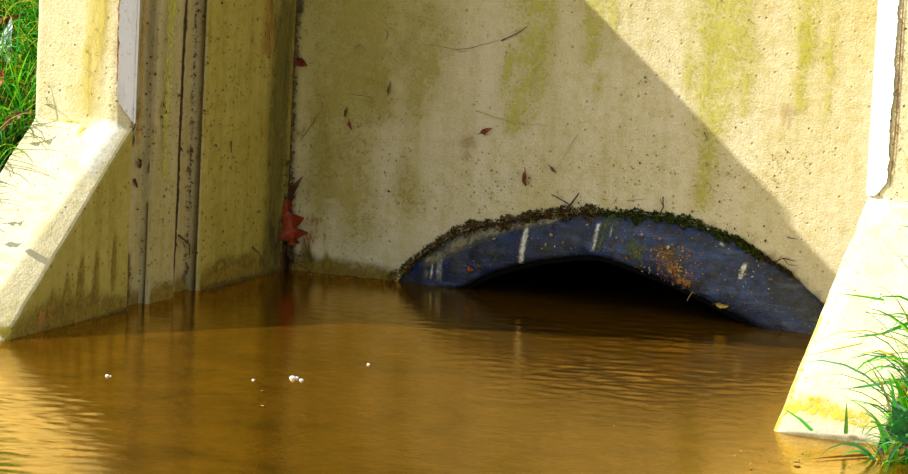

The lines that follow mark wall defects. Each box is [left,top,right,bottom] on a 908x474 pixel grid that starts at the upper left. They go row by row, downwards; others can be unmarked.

water stain [683,12,717,131]
water stain [61,252,99,321]